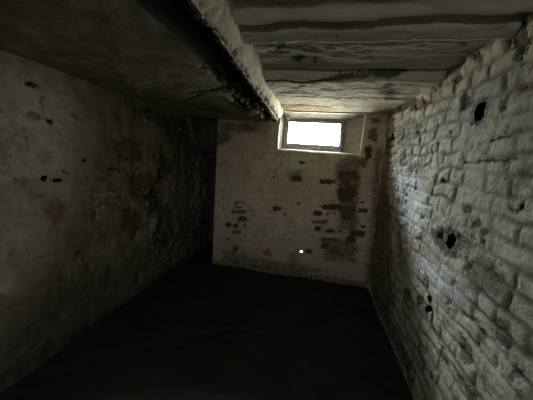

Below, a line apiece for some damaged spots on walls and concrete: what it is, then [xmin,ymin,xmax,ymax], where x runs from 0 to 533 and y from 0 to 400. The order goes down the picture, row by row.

water stain [217,169,428,387]
water stain [416,256,467,304]
spalling [431,219,509,298]